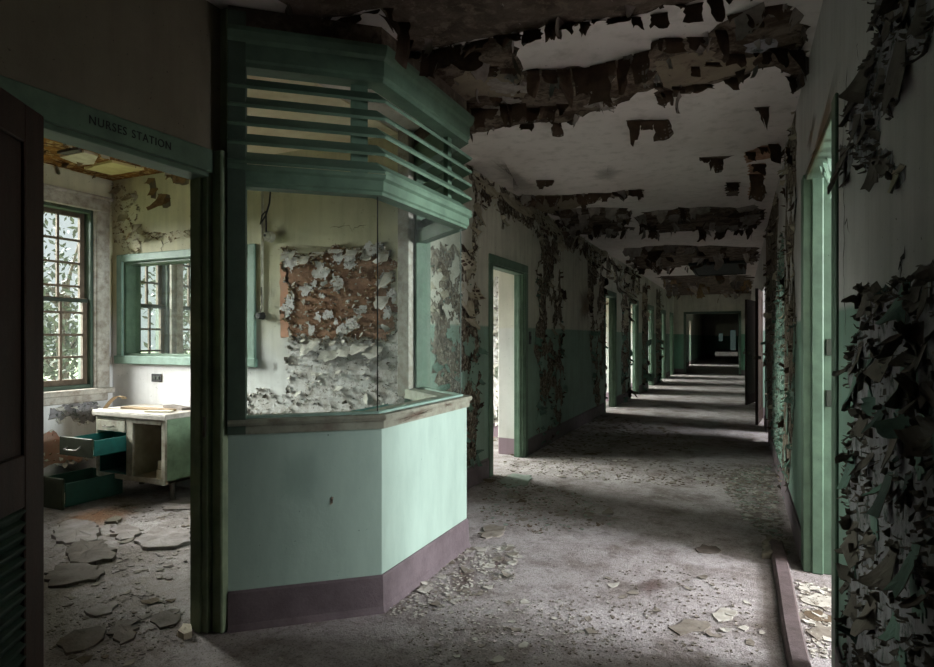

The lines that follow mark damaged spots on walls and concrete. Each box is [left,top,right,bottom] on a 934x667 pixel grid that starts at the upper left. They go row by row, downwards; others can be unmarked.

peeling [279,0,811,146]
peeling [827,0,934,194]
peeling [44,138,190,255]
peeling [247,241,405,415]
peeling [431,111,797,500]
peeling [44,401,100,468]
peeling [832,260,934,667]